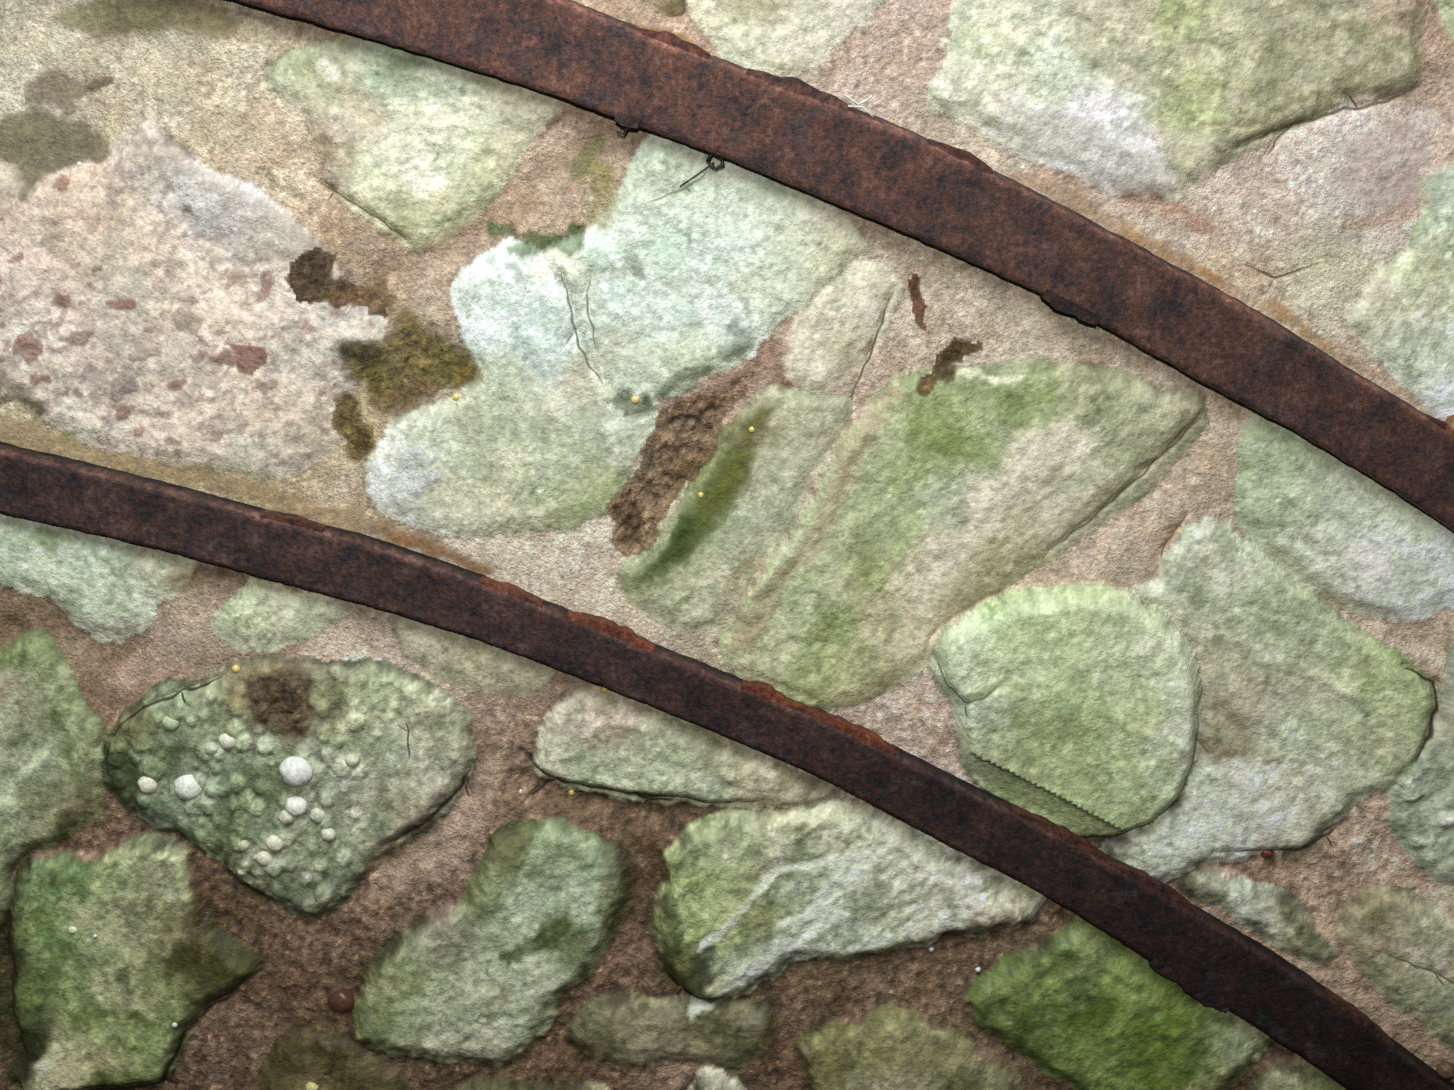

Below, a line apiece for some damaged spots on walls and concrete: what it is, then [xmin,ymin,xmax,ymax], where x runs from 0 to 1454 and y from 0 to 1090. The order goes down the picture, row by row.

corrosion [639,28,710,59]
corrosion [745,68,849,112]
corrosion [927,138,992,174]
corrosion [908,273,927,329]
corrosion [1040,289,1101,325]
corrosion [1426,414,1454,437]
corrosion [0,419,544,608]
corrosion [565,610,655,653]
corrosion [741,679,897,756]
corrosion [1011,804,1197,915]
corrosion [1149,957,1231,1012]
corrosion [1325,988,1394,1046]